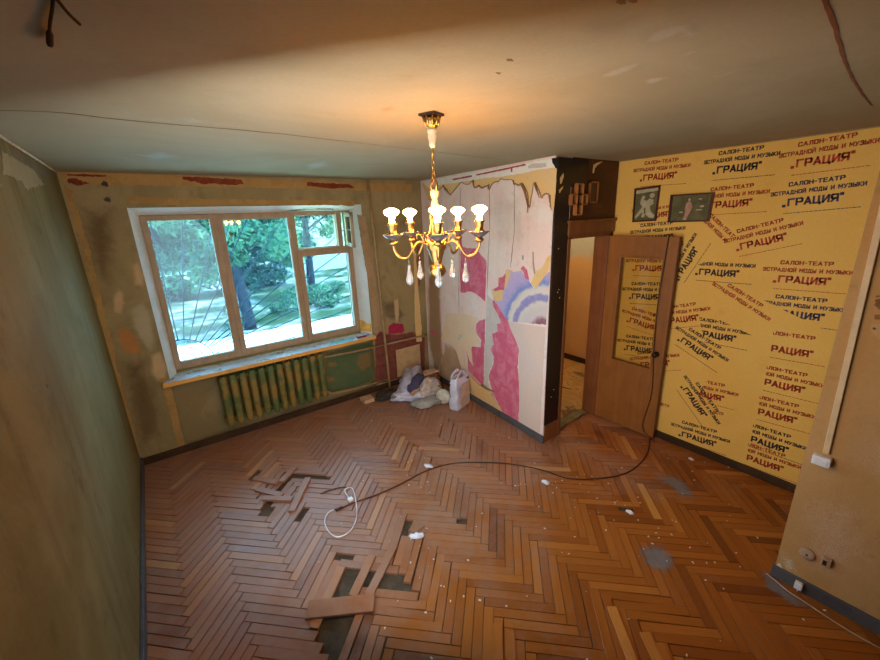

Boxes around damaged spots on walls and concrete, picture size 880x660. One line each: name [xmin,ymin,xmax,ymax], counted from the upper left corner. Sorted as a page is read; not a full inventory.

crack [822,0,872,106]
flaking render [483,295,501,387]